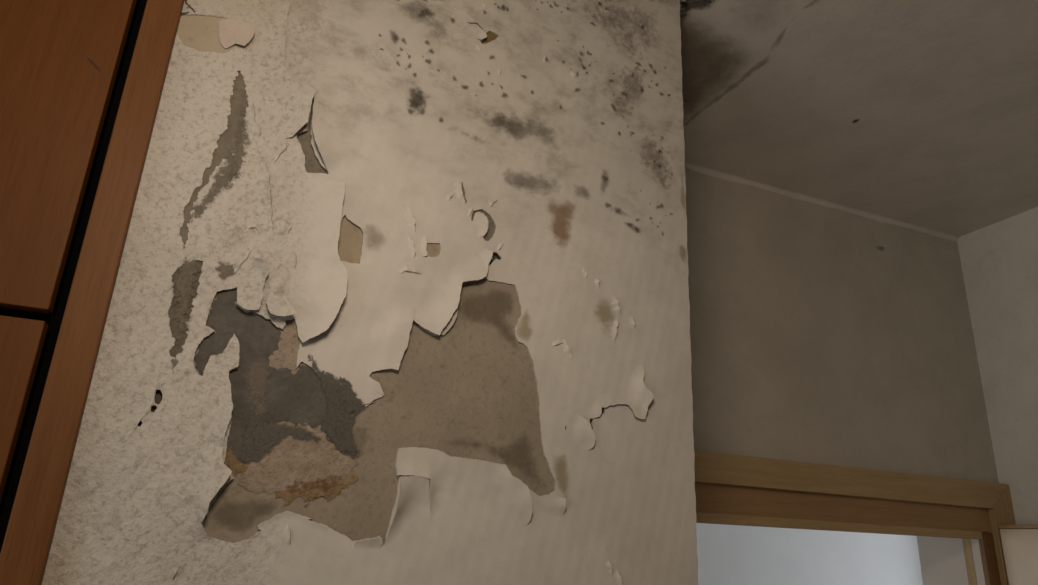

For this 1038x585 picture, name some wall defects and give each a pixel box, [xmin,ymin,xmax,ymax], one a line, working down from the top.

damp [632,0,728,107]
damp [409,89,425,113]
damp [553,207,571,239]
peeling [168,0,566,550]
peeling [565,364,654,451]